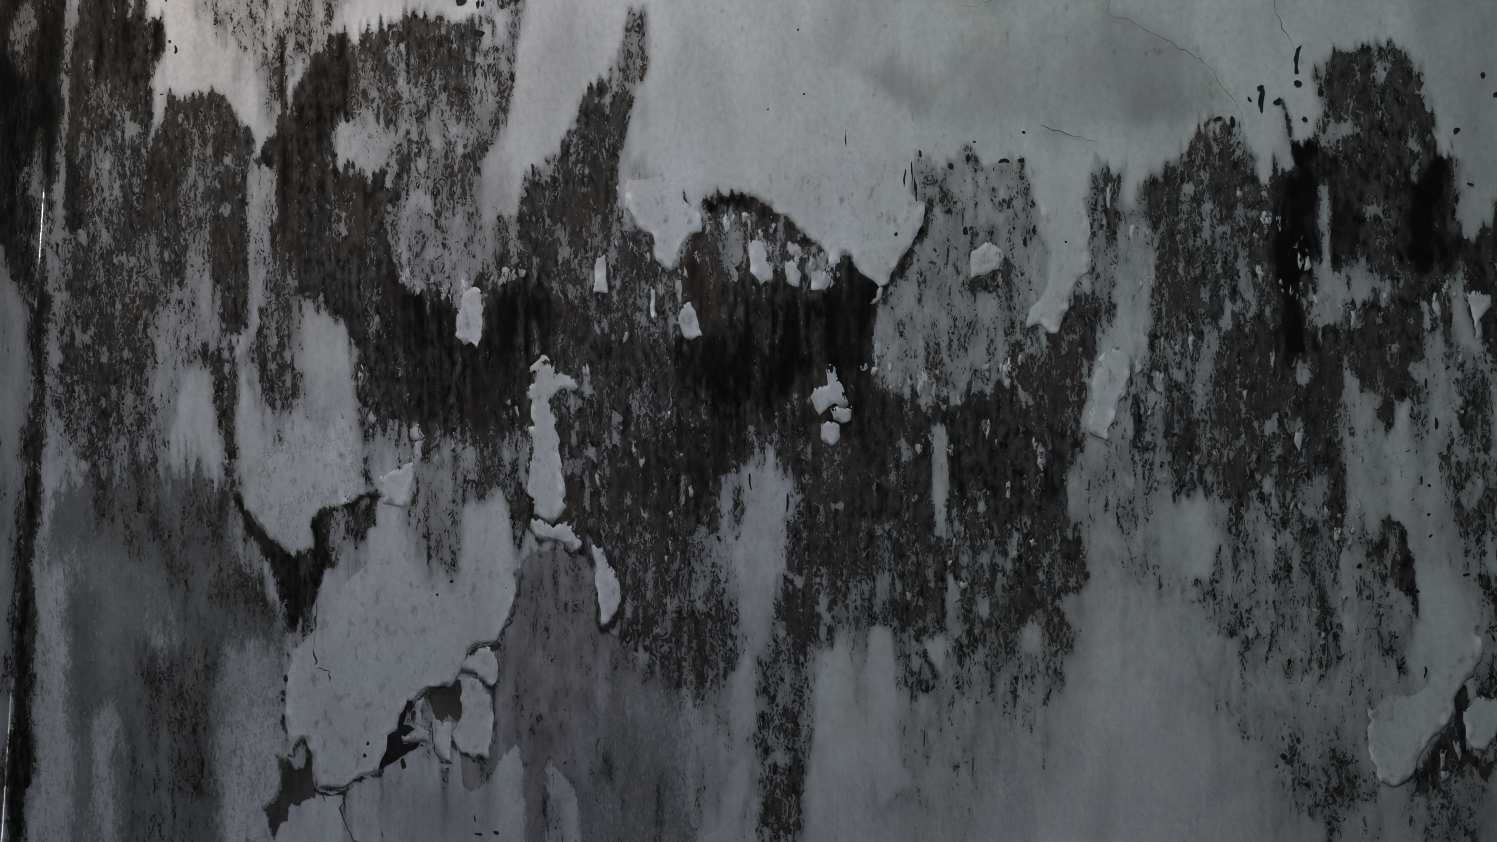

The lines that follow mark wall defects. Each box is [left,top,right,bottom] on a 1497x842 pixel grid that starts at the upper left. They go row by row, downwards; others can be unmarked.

crack [1107,1,1243,120]
peeling [395,249,526,348]
peeling [587,130,925,343]
peeling [1022,183,1111,335]
peeling [1432,276,1494,364]
peeling [810,364,852,446]
peeling [1088,320,1218,441]
damp [485,630,508,672]
damp [508,573,528,622]
peeling [1366,625,1497,787]
damp [523,753,577,842]
damp [584,694,710,842]